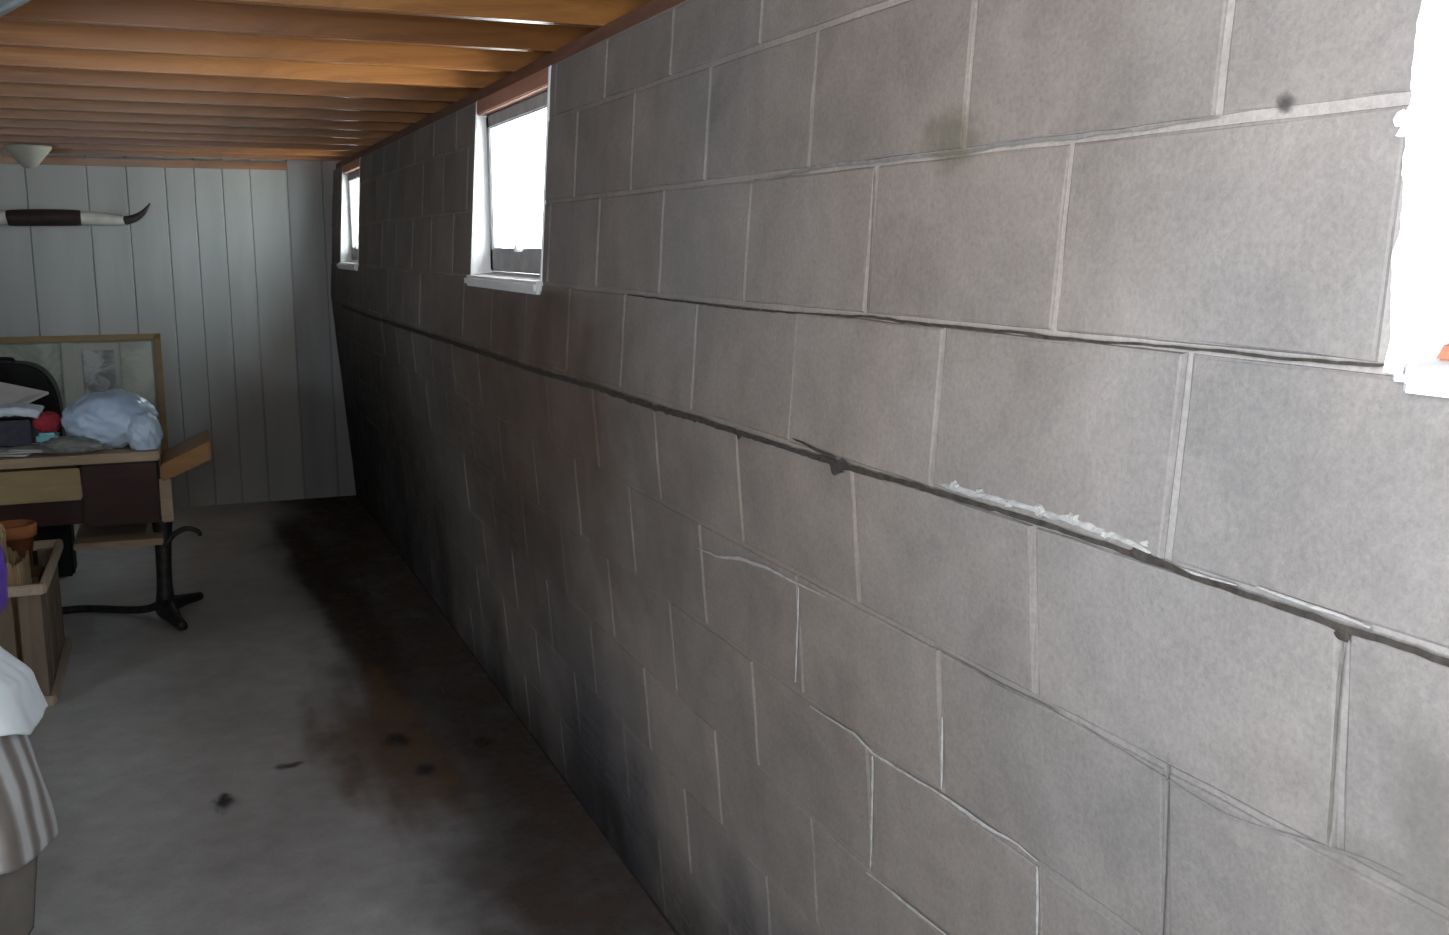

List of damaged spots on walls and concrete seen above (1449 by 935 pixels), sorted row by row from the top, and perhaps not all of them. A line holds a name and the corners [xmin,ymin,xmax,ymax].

crack [627,115,1384,367]
water stain [279,310,696,935]
crack [342,304,1449,935]